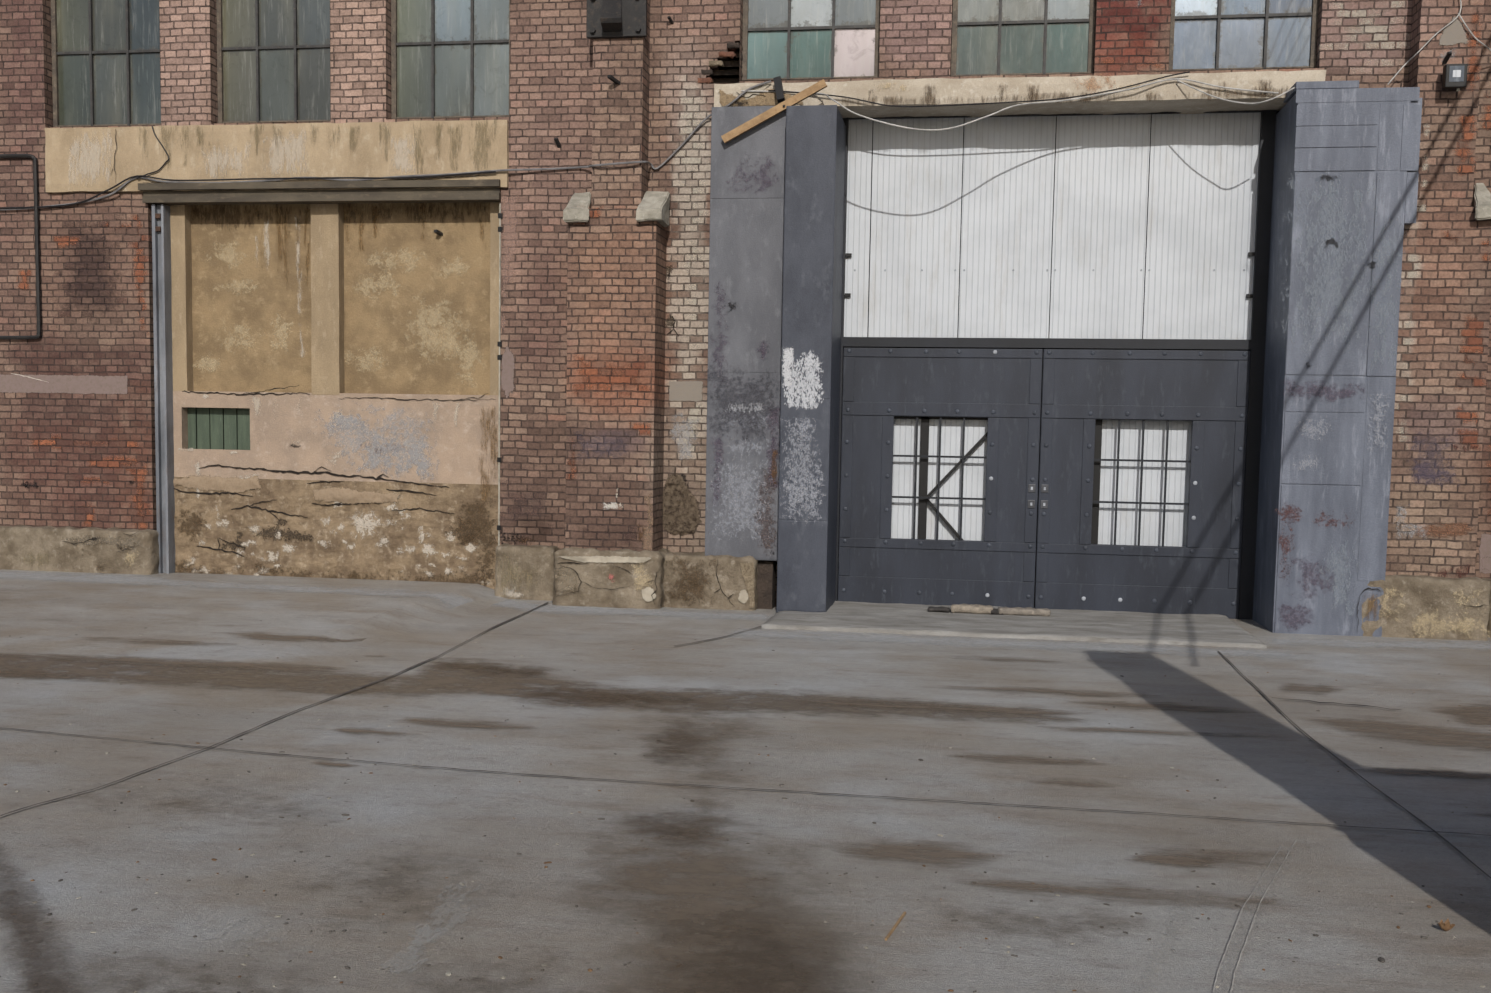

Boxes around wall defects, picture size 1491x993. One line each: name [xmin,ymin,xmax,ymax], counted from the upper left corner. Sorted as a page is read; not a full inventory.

spalling [698,42,804,107]
water stain [203,131,306,178]
water stain [193,204,309,273]
crack [174,464,454,557]
peeling [185,501,476,576]
rust [1276,505,1352,630]